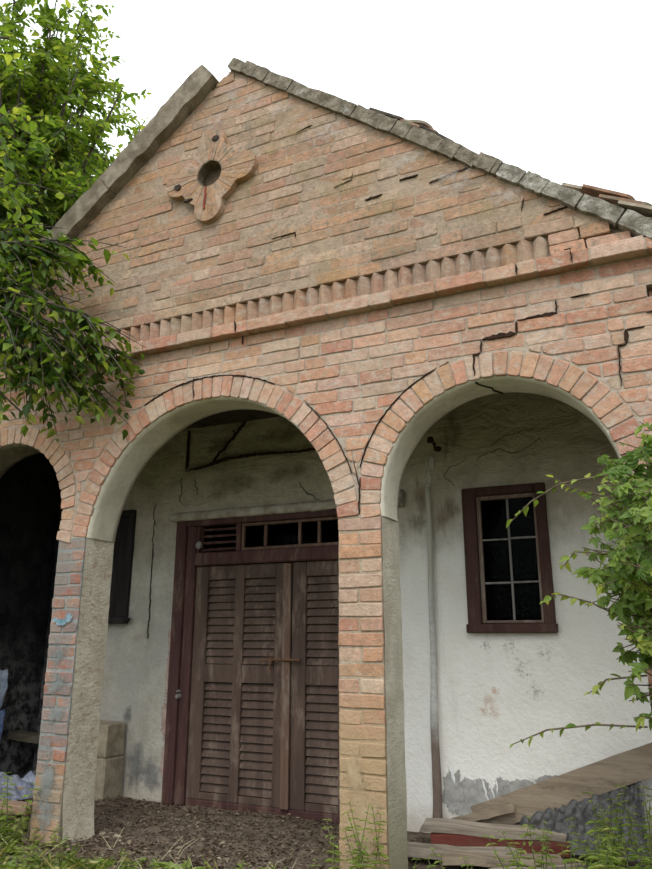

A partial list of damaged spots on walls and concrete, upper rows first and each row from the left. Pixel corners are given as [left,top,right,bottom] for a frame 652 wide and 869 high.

crack [472,293,589,394]
crack [144,375,273,406]
crack [179,421,315,505]
crack [306,370,434,514]
crack [147,503,156,639]
peeling [53,613,73,626]
flaking render [442,770,556,816]